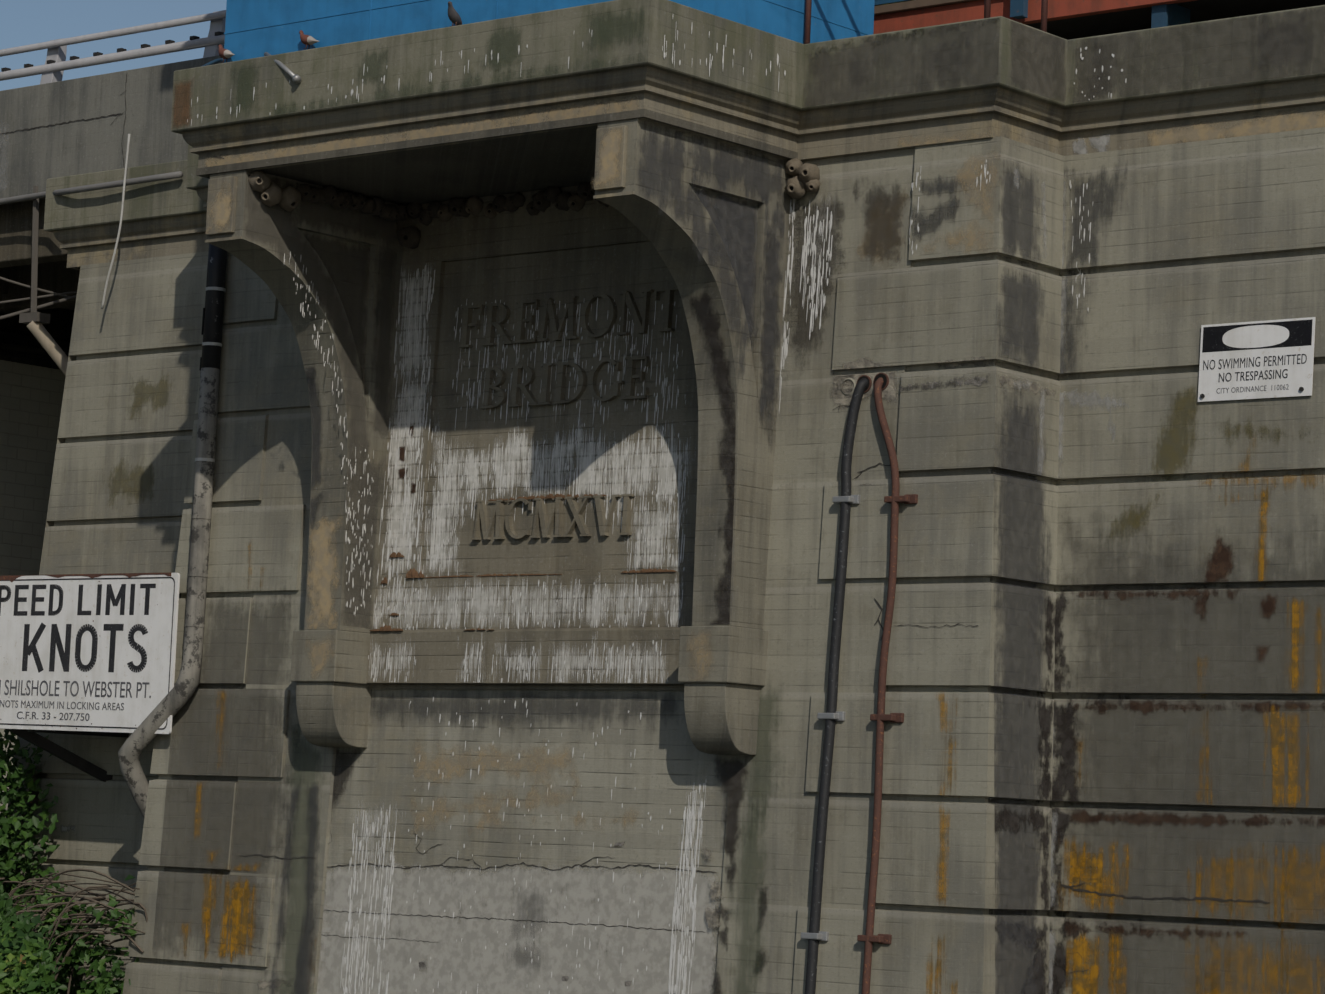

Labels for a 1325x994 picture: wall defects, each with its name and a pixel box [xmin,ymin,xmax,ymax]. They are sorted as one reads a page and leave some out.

water stain [206,98,638,167]
water stain [909,159,1035,257]
water stain [1059,172,1114,374]
water stain [639,130,833,624]
water stain [247,179,686,683]
corrosion [1259,491,1268,581]
corrosion [1291,599,1320,690]
water stain [989,405,1270,994]
corrosion [182,854,256,959]
water stain [283,750,746,994]
corrosion [1065,843,1129,908]
corrosion [1067,934,1126,994]